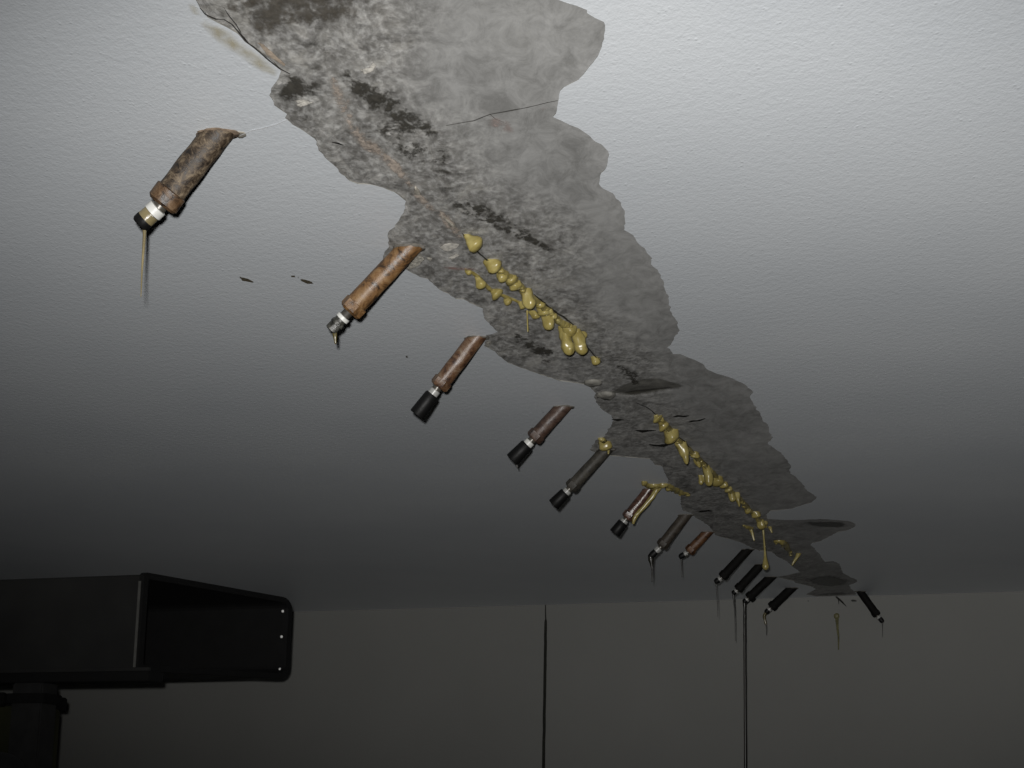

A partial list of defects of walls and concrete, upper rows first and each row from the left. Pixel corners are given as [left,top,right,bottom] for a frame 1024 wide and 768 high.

peeling [197,0,857,596]
crack [533,294,574,325]